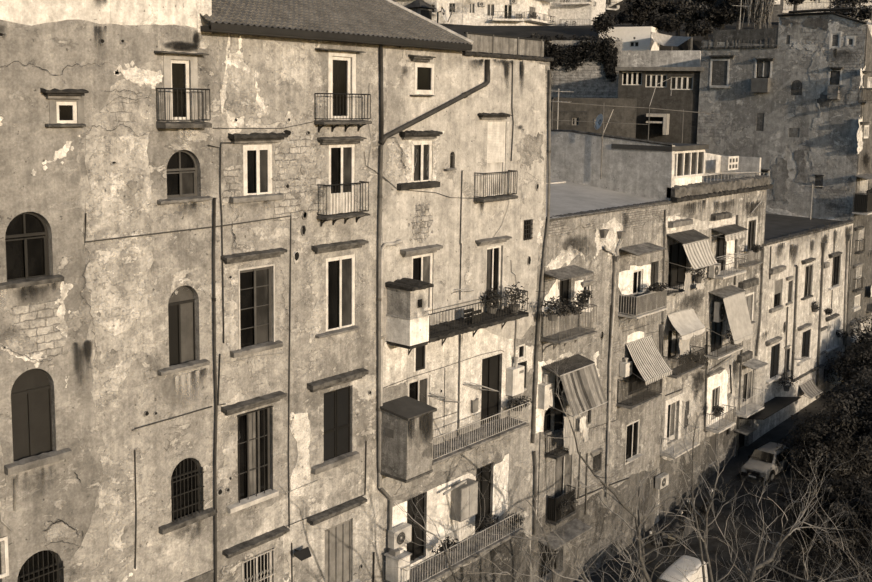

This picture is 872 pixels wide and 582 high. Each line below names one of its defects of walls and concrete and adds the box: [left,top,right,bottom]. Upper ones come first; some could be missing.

peeling [114,61,163,89]
peeling [198,34,268,134]
flaking render [777,16,866,130]
peeling [766,139,839,221]
peeling [0,130,154,413]
peeling [527,206,667,270]
water stain [75,341,92,377]
peeling [289,412,313,498]